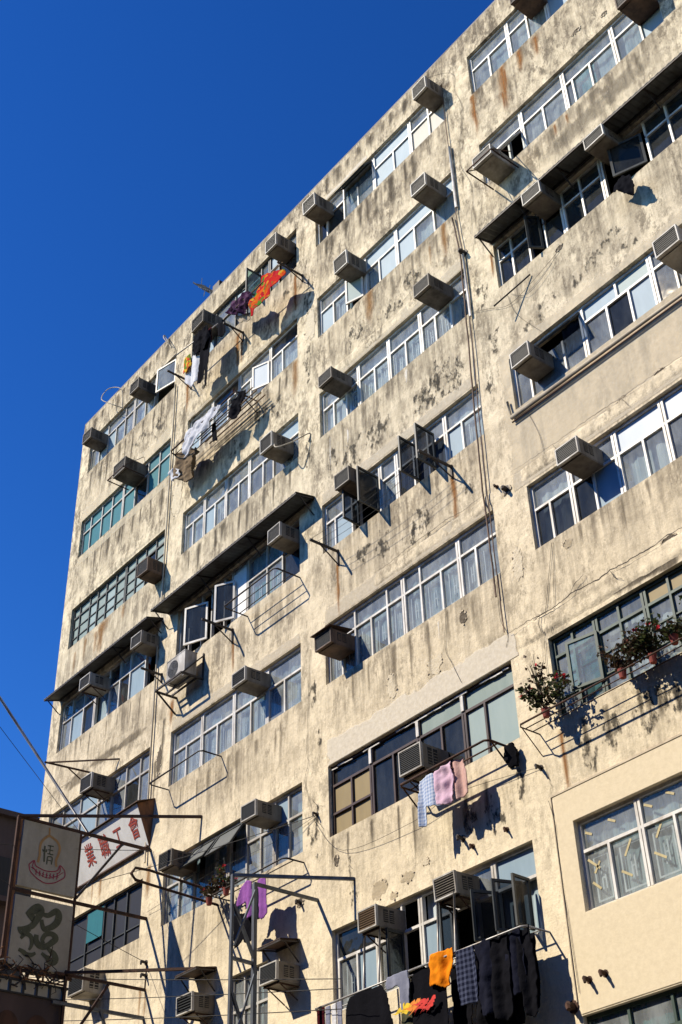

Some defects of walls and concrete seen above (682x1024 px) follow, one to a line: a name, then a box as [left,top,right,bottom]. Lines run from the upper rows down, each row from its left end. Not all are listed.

water stain [413,357,464,413]
water stain [328,414,388,470]
crack [509,528,681,633]